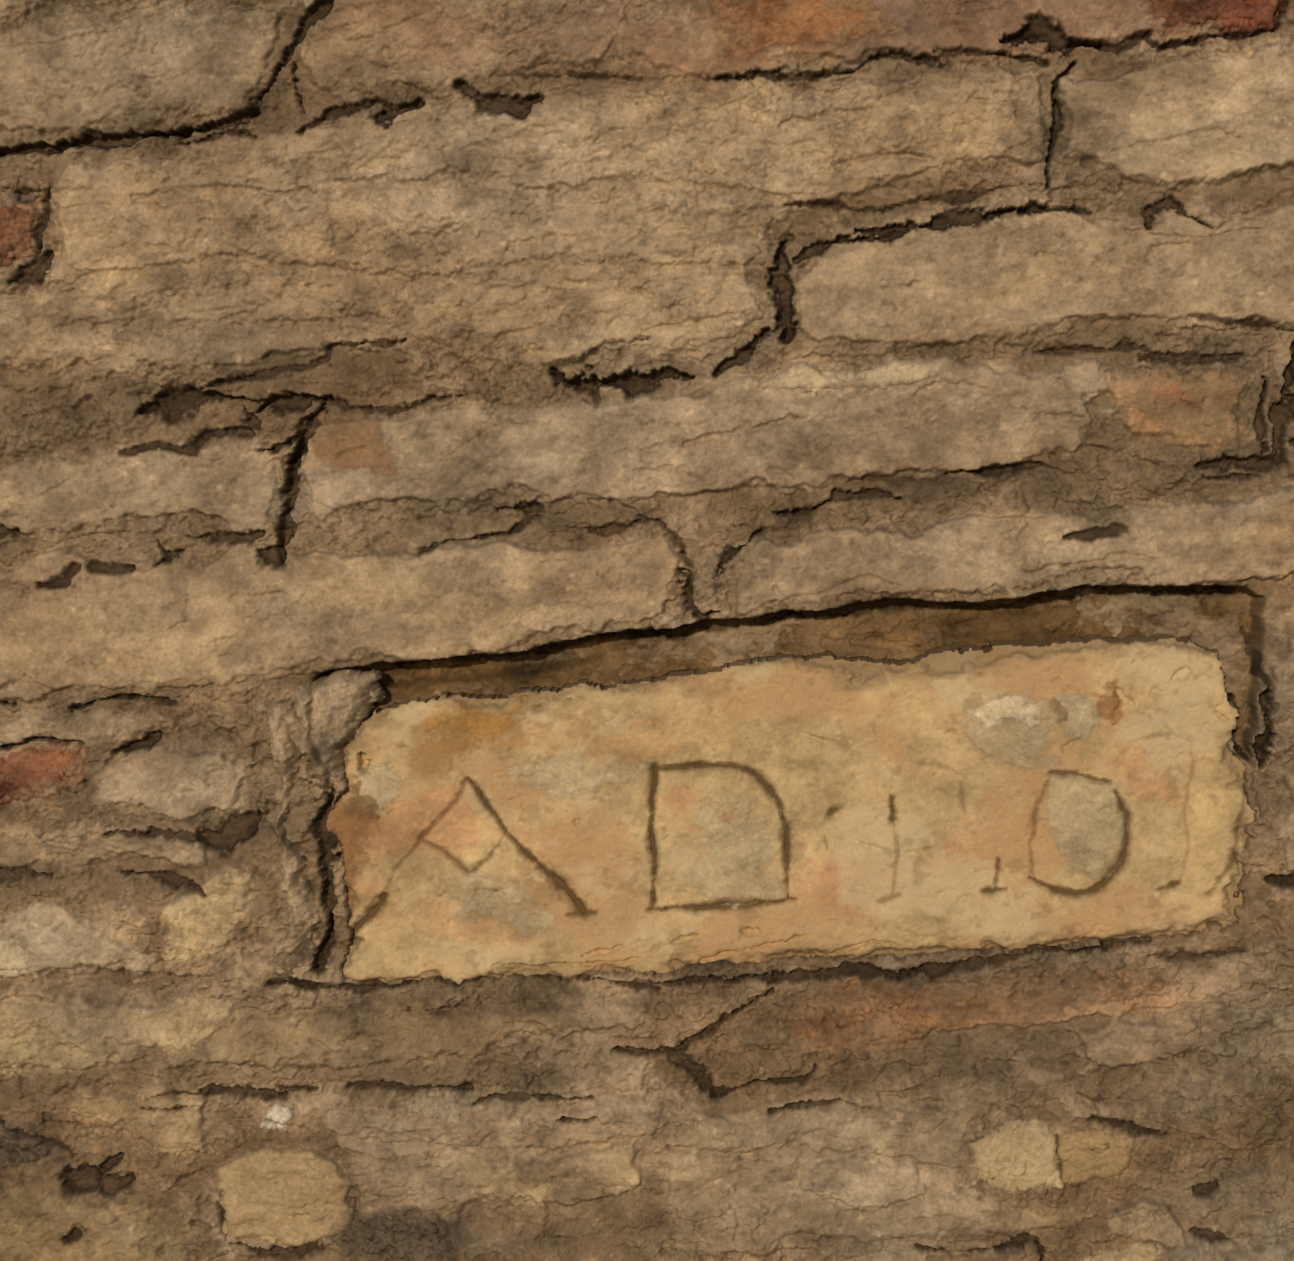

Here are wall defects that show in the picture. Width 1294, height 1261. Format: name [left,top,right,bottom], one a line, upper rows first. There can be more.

crack [38,339,444,588]
crack [419,502,542,554]
crack [451,477,1233,660]
crack [1227,627,1273,766]
crack [540,936,1246,1113]